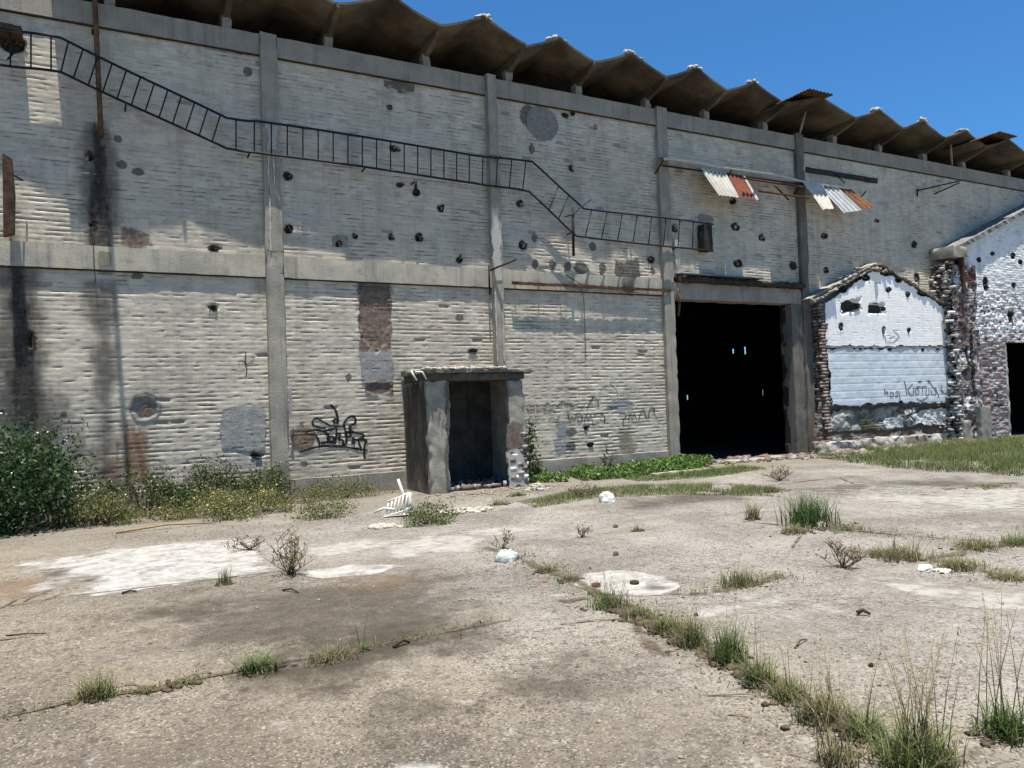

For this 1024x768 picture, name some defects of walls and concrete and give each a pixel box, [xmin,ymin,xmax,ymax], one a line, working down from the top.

leakage [82,123,117,247]
leakage [0,267,68,482]
leakage [85,285,113,399]
peeling [357,283,393,351]
peeling [365,382,394,396]
spalling [810,285,886,442]
peeling [883,408,949,429]